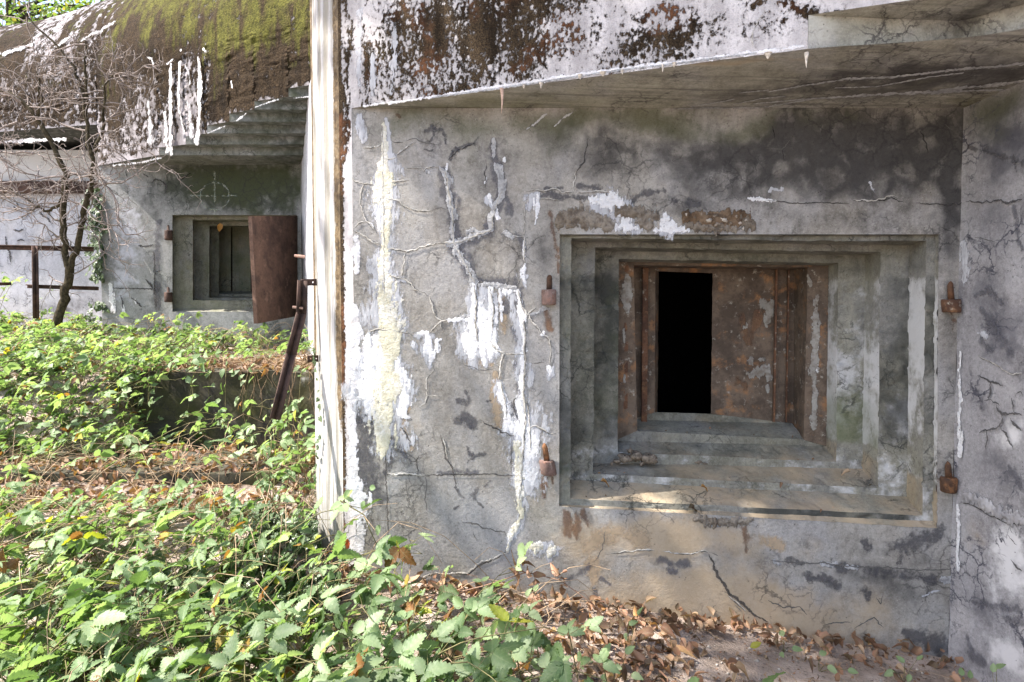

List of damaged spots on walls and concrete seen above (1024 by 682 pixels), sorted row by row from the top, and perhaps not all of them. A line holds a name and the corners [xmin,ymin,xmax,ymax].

water stain [147,47,279,156]
crack [573,139,588,193]
crack [350,138,555,381]
spalling [554,197,756,236]
crack [747,181,1023,251]
crack [977,356,1022,450]
crack [385,397,556,540]
rust [563,509,586,539]
crack [594,533,884,628]